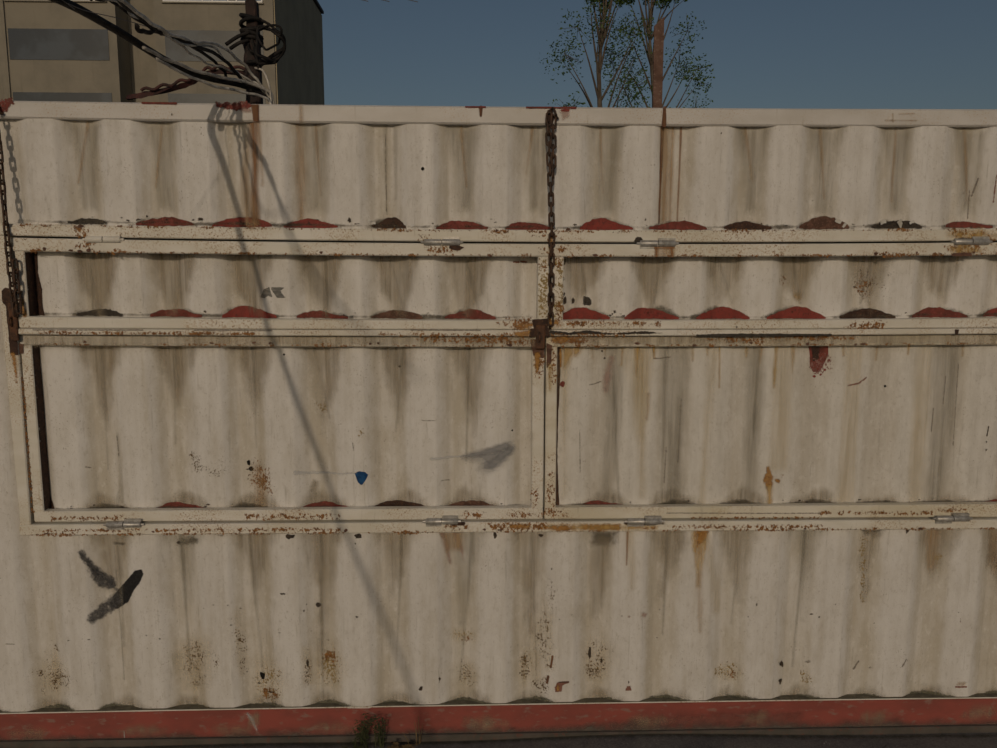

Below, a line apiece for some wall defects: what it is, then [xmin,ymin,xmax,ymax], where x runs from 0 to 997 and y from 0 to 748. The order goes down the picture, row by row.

rust [654,106,682,232]
rust [771,226,997,258]
rust [635,320,891,357]
peeling [808,346,833,378]
rust [2,288,274,513]
rust [32,513,348,537]
rust [393,467,967,568]
rust [301,640,341,684]